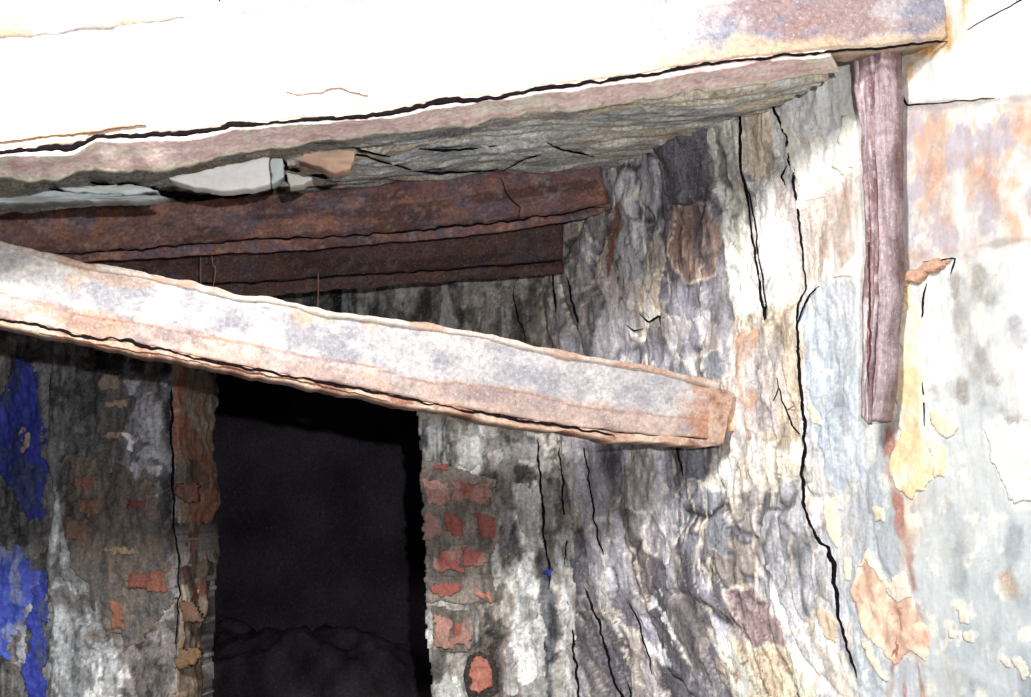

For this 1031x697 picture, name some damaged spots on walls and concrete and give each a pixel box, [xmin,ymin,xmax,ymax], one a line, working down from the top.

crack [0,0,1022,155]
crack [52,142,609,255]
crack [738,116,767,320]
peeling [0,357,49,521]
crack [0,318,632,697]
crack [772,106,857,678]
crack [865,242,873,385]
flaking render [889,284,959,499]
flaking render [984,416,1031,503]
peeling [0,544,51,697]
flaking render [816,607,839,643]
flaking render [822,499,930,681]